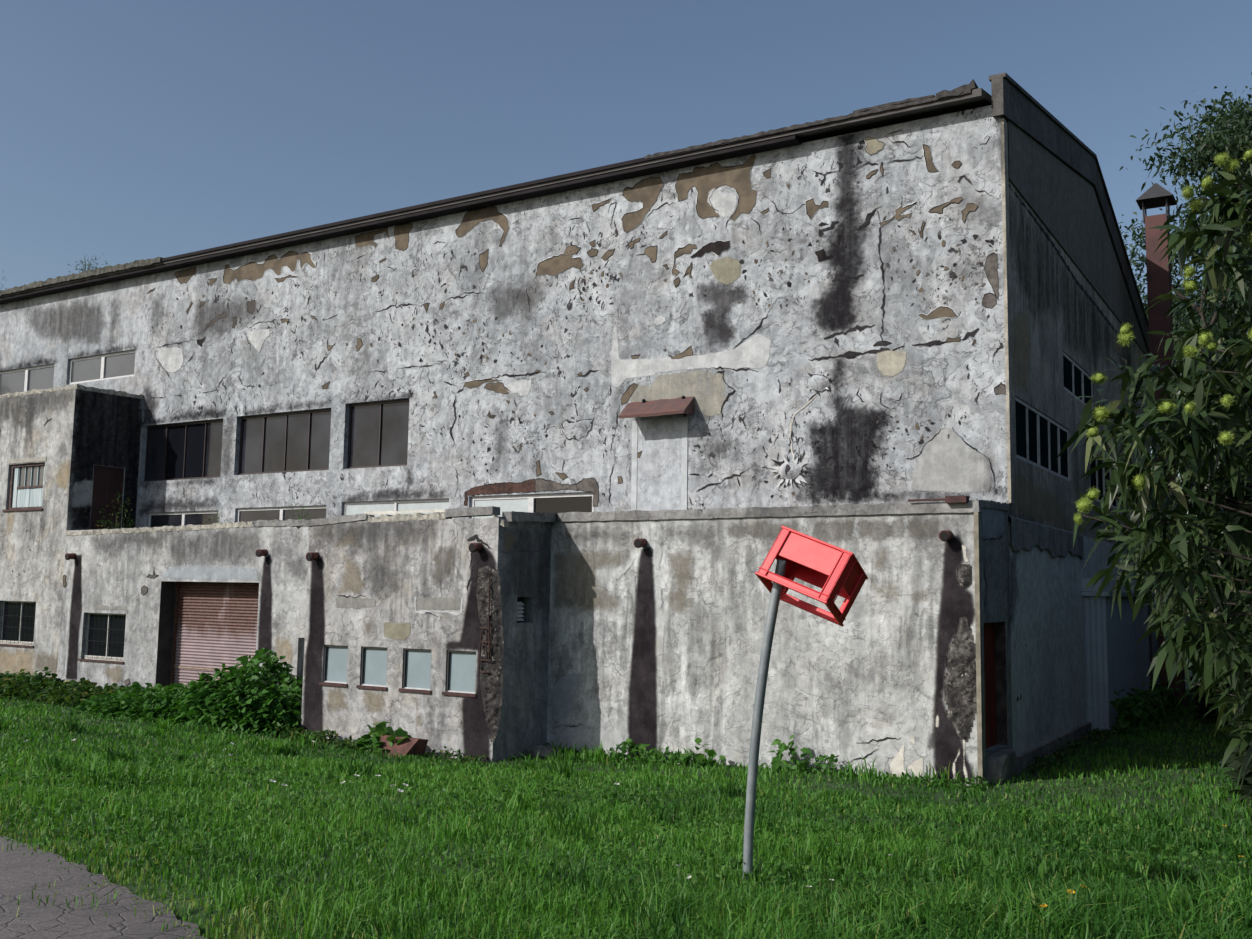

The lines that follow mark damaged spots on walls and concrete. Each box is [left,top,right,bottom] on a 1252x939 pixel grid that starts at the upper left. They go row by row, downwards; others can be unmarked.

leakage [0,390,159,550]
peeling [152,250,317,347]
peeling [455,206,510,272]
peeling [536,154,834,309]
crack [709,307,772,420]
crack [789,393,817,455]
crack [714,129,979,361]
leakage [805,359,894,503]
crack [856,387,902,412]
leakage [303,557,345,735]
leakage [628,547,657,758]
leakage [815,521,975,783]